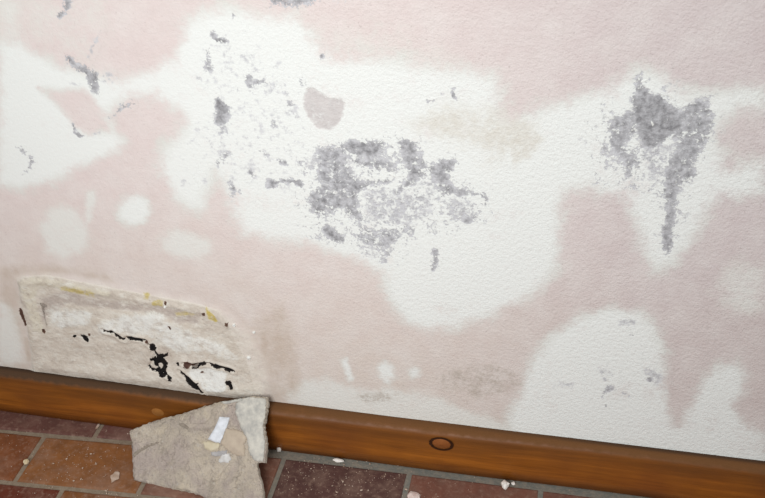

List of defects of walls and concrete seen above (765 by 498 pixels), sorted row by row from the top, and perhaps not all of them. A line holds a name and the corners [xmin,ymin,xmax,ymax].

crack [73,329,235,393]